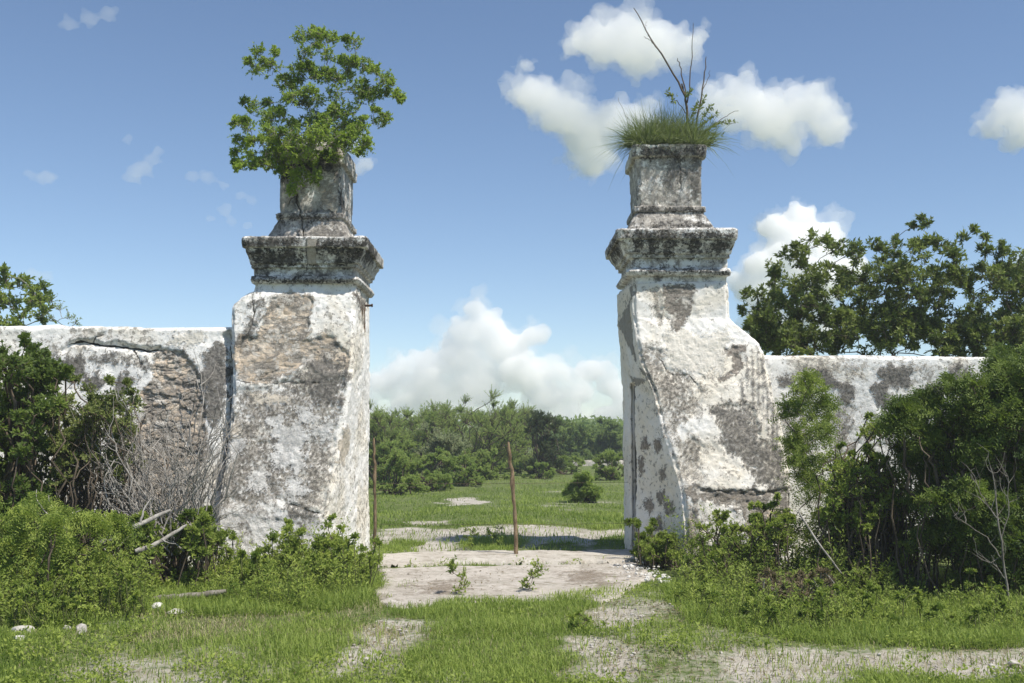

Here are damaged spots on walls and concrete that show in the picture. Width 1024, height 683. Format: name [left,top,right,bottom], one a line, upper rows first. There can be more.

damp [606,144,738,279]
crack [69,335,159,362]
flaking render [125,347,209,509]
flaking render [218,289,352,555]
damp [198,147,378,429]
flaking render [646,283,698,334]
damp [672,346,813,490]
damp [798,358,943,459]